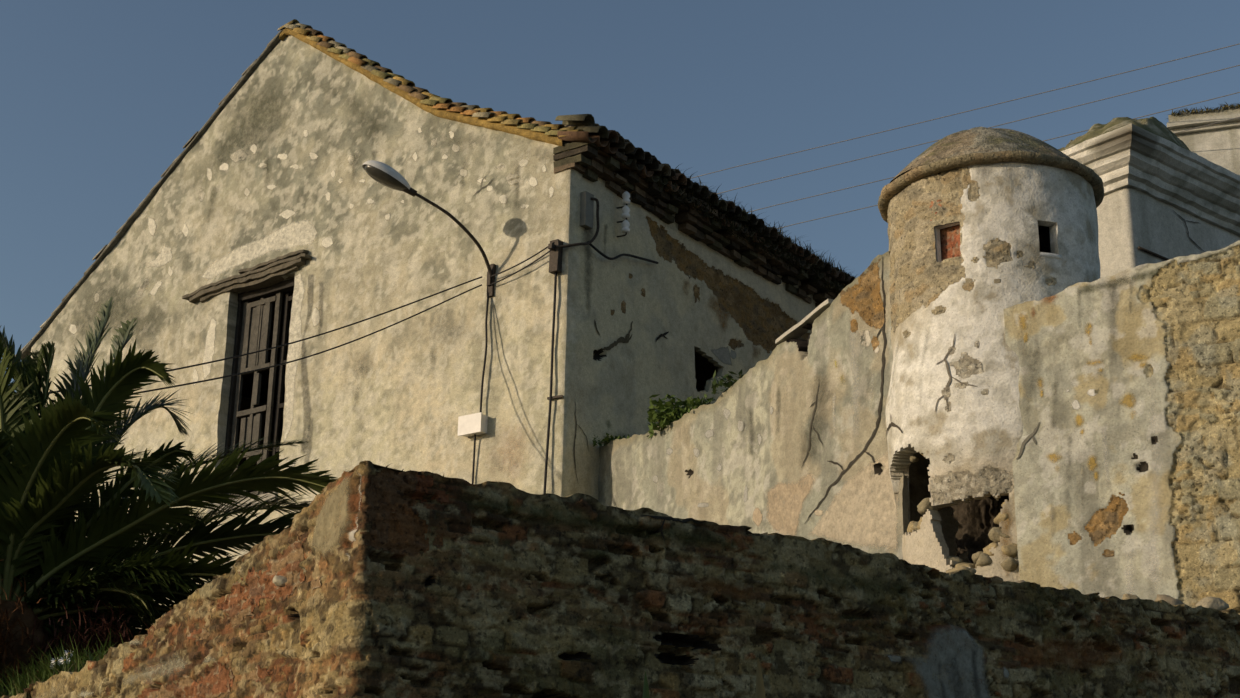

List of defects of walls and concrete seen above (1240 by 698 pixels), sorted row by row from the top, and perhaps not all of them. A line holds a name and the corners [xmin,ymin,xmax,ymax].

flaking render [645,216,810,353]
flaking render [840,167,1035,353]
crack [642,515,707,540]
crack [801,258,902,524]
flaking render [744,453,1019,572]
crack [935,334,978,412]
flaking render [1068,492,1134,557]
flaking render [1131,453,1148,472]
flaking render [1137,245,1240,615]